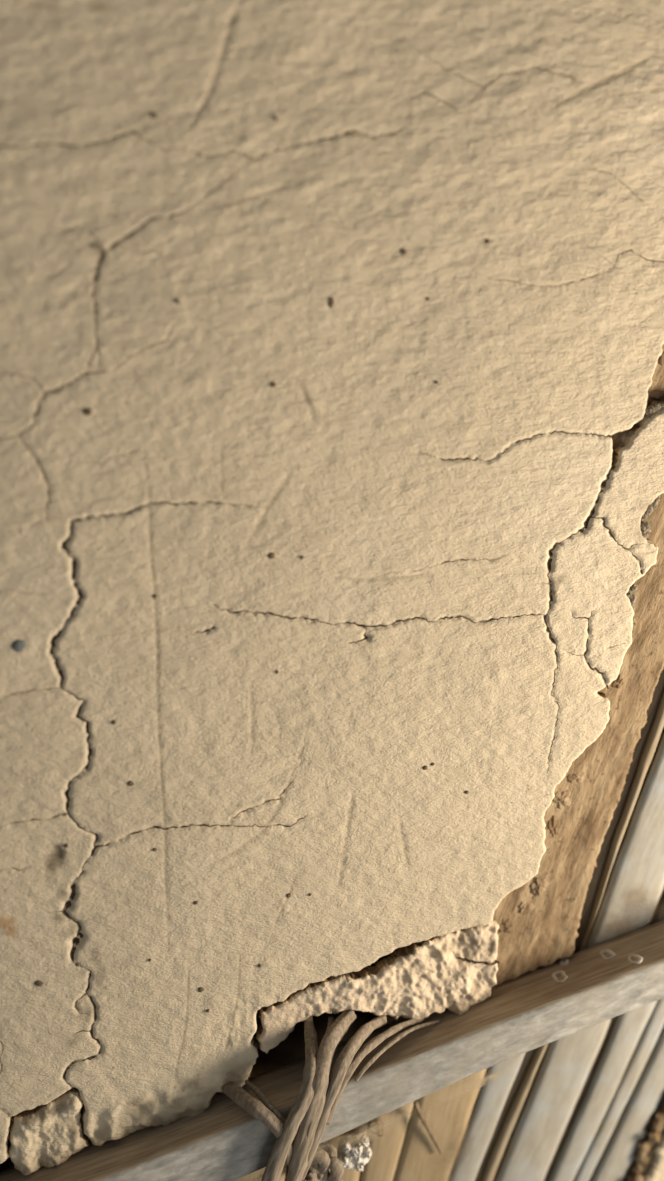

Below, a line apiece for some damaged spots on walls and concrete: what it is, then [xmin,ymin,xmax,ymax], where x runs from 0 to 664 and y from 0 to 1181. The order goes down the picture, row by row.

crack [0,43,576,1091]
crack [191,430,652,772]
crack [474,245,664,287]
spalling [611,344,664,462]
spalling [255,493,664,1054]
spalling [627,1102,664,1181]